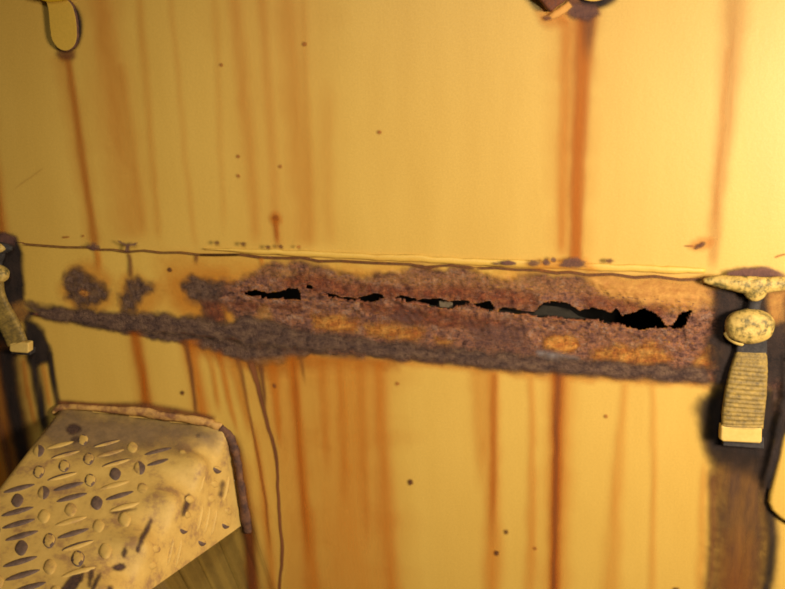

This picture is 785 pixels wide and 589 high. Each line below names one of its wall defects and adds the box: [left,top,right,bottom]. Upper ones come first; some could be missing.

rust [0,233,785,589]